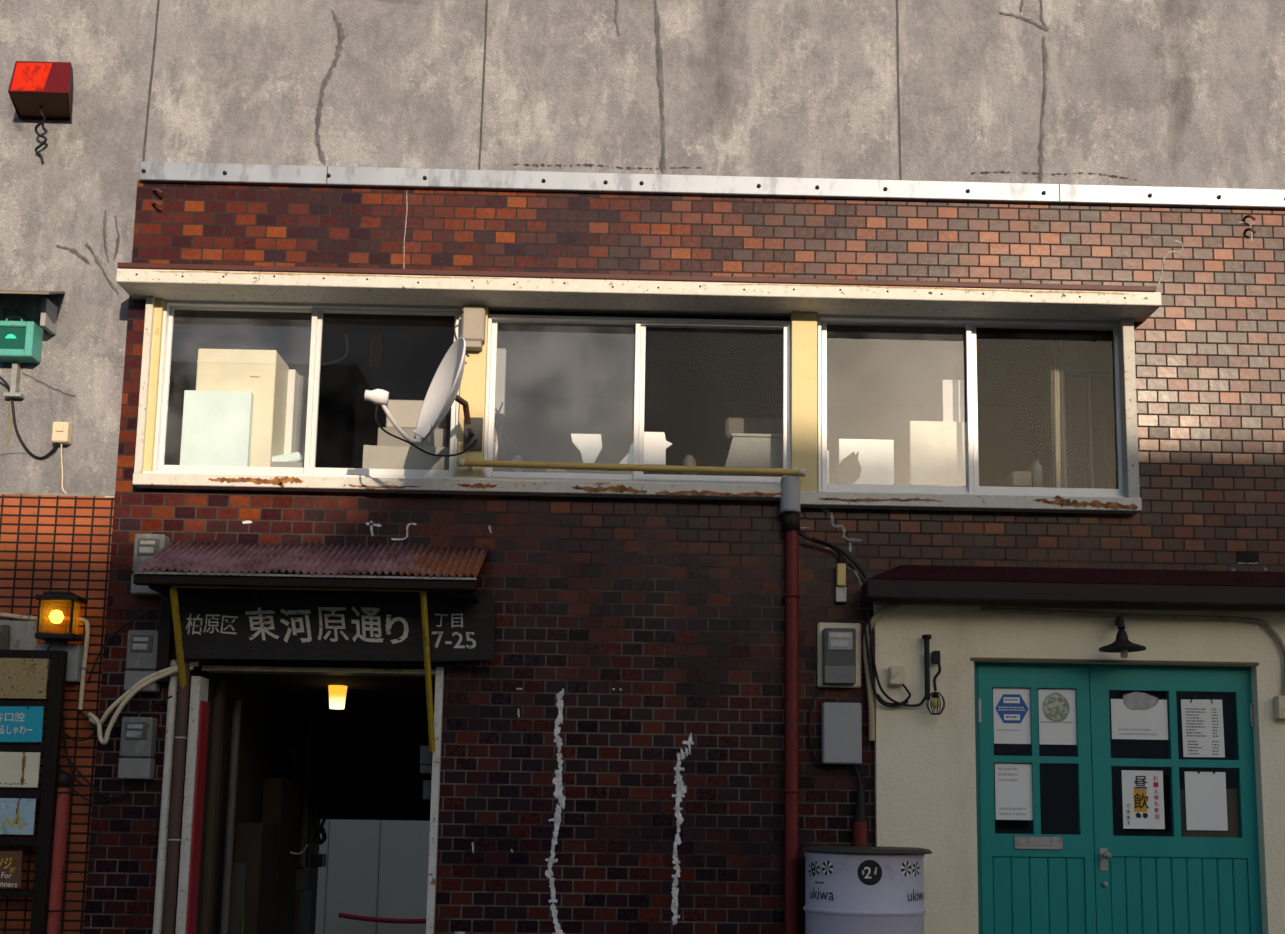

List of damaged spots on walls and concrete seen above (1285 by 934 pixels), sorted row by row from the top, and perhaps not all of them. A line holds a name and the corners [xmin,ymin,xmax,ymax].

crack [613,0,621,35]
crack [315,10,344,163]
crack [654,0,665,172]
crack [999,0,1049,181]
crack [57,210,120,294]
corrosion [209,476,302,488]
corrosion [571,485,781,497]
corrosion [1035,495,1138,510]